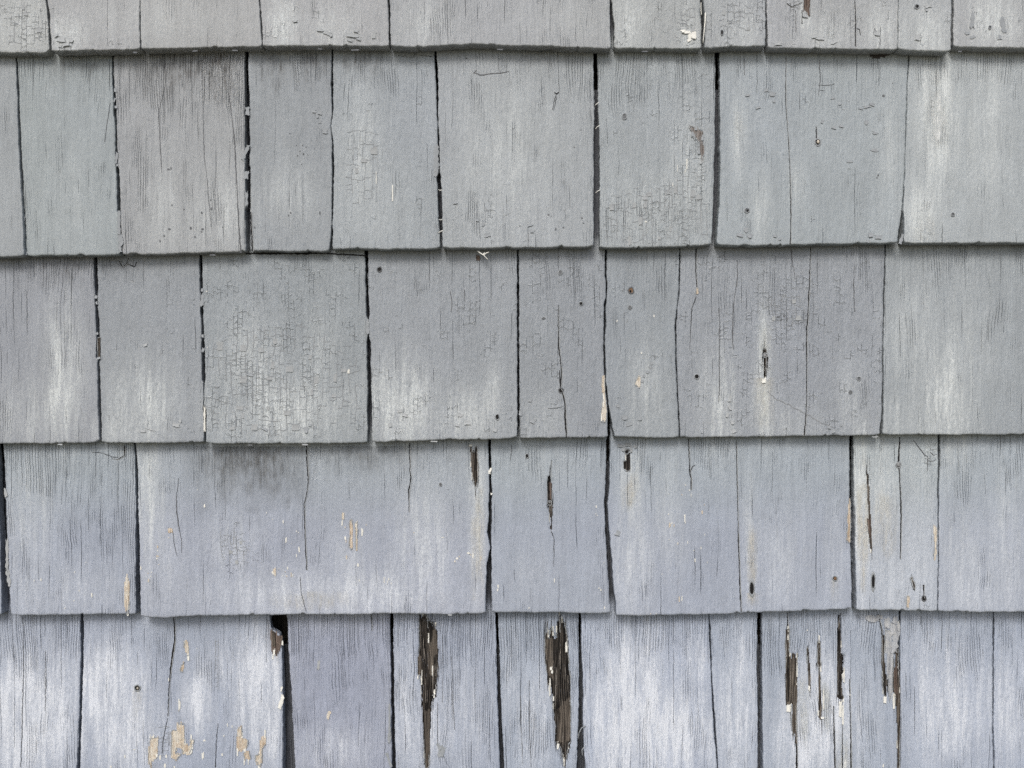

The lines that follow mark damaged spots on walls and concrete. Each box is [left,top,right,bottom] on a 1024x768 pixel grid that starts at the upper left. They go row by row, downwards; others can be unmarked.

crack [212,322,360,610]
peeling [148,699,205,768]
peeling [223,723,266,768]
peeling [785,625,824,744]
peeling [865,615,901,768]